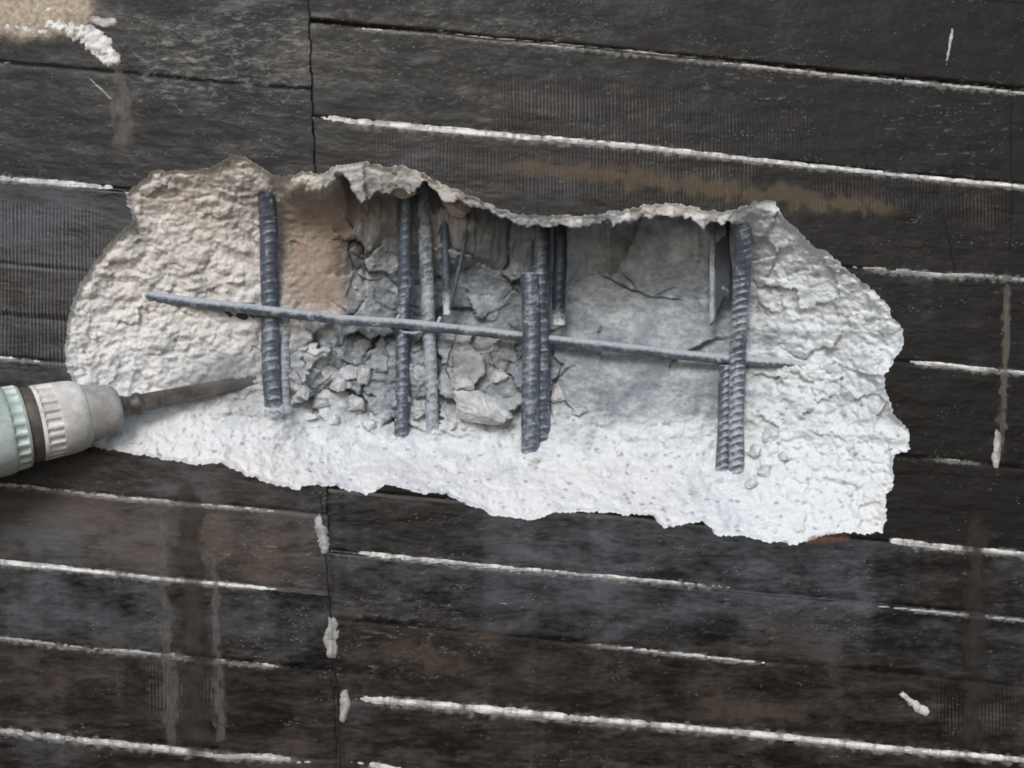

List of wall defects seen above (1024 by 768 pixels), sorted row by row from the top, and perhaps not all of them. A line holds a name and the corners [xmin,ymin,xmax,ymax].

crack [309,69,317,162]
spalling [65,155,910,545]
water stain [0,483,310,763]